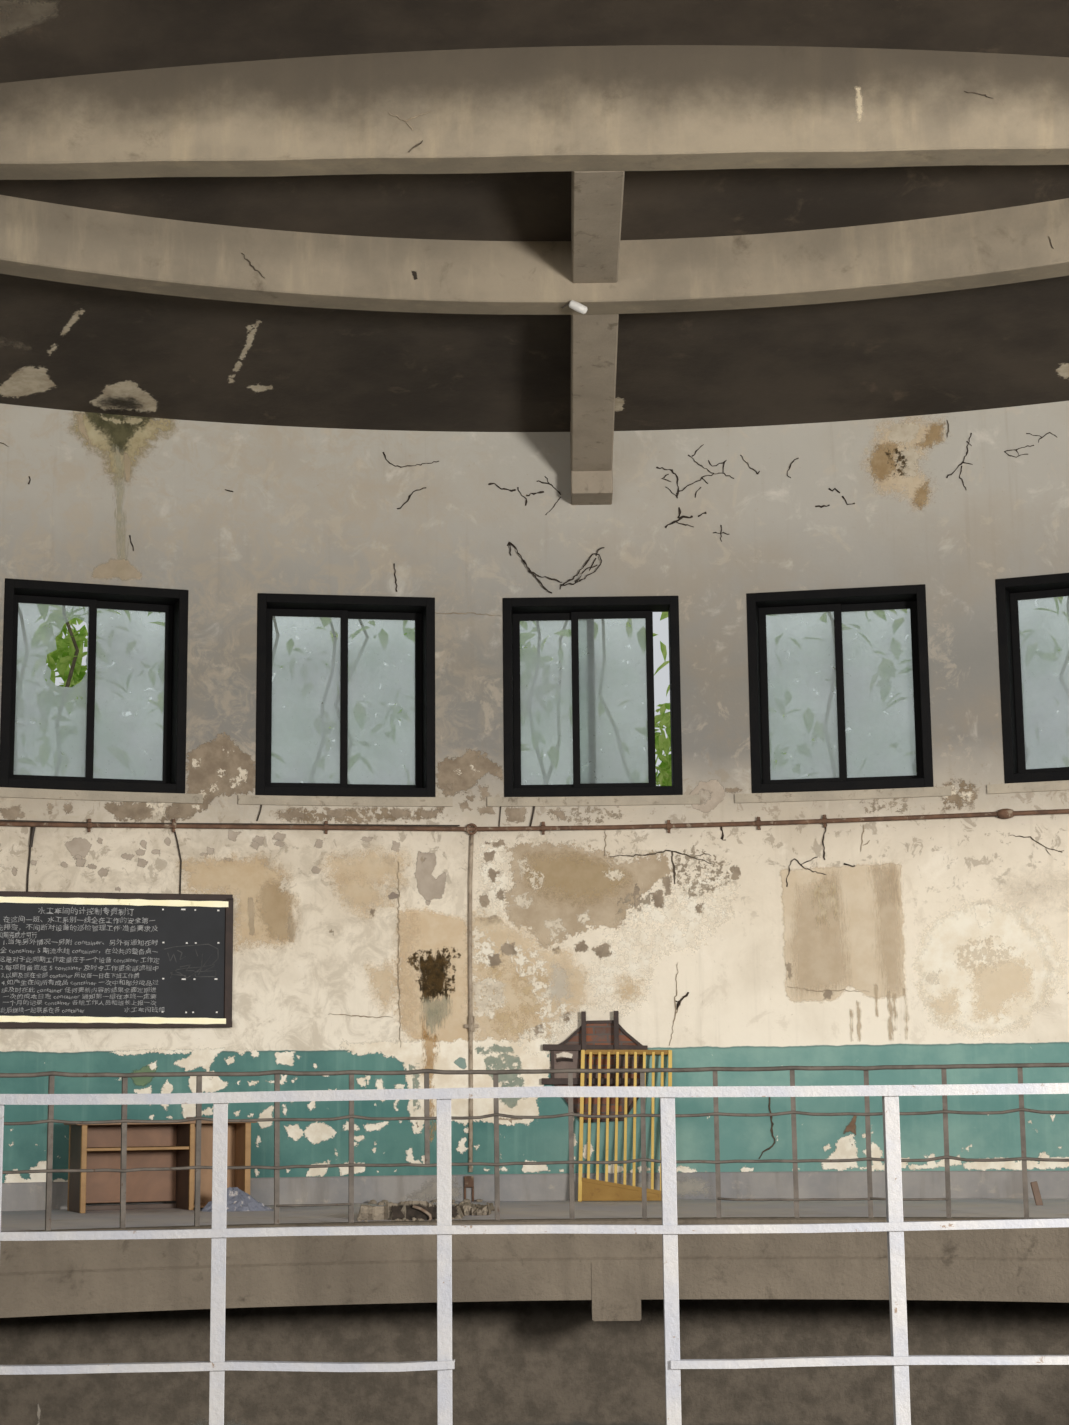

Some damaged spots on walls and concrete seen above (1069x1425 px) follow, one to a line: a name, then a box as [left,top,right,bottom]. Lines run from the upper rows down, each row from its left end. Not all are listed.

peeling [0,310,85,399]
peeling [228,320,273,392]
damp [73,412,175,580]
damp [867,421,945,510]
peeling [228,748,526,850]
damp [328,852,584,1044]
peeling [234,806,741,1177]
damp [780,863,1064,1039]
peeling [4,1144,68,1183]
peeling [112,1047,337,1120]
crack [758,1097,776,1159]
flaking render [821,1116,1069,1171]